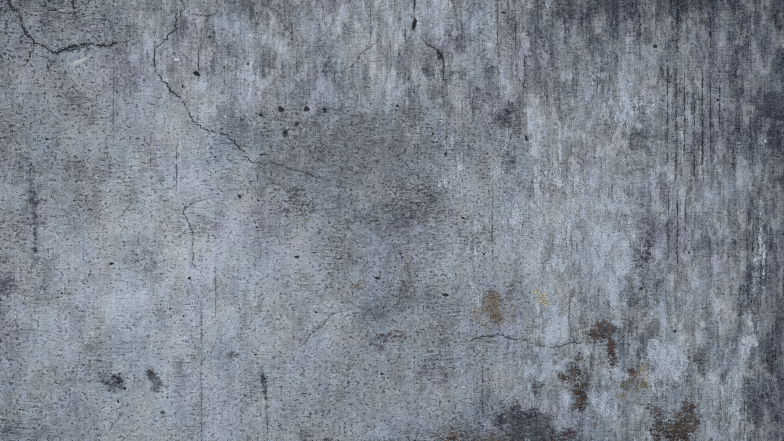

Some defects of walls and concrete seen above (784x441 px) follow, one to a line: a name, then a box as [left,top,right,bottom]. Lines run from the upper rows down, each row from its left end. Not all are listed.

crack [7,0,117,63]
crack [154,1,319,178]
water stain [627,94,655,173]
water stain [750,86,784,188]
water stain [753,228,766,291]
rust [483,286,516,327]
crack [472,334,581,348]
rust [556,319,620,411]
rust [621,368,656,391]
rust [646,399,701,441]